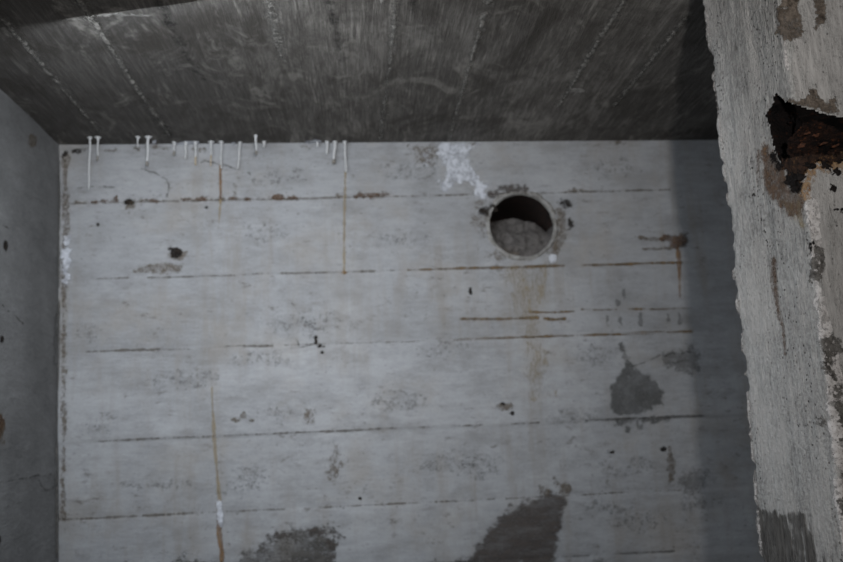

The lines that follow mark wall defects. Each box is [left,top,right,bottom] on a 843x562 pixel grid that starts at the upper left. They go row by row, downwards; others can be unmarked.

peeling [775,0,804,71]
peeling [814,0,827,30]
rust [217,165,251,217]
rust [335,172,389,274]
water stain [410,142,487,199]
rust [757,144,843,227]
spalling [765,89,843,193]
water stain [610,361,666,433]
peeling [804,198,843,551]
rust [216,498,224,562]
water stain [240,524,346,562]
water stain [455,477,572,562]